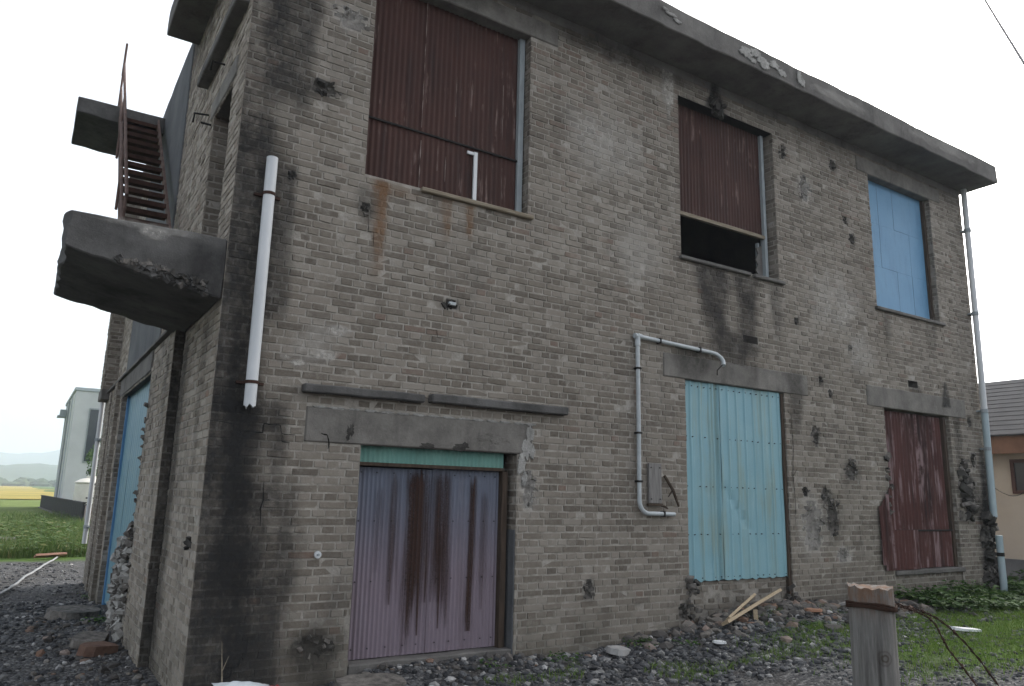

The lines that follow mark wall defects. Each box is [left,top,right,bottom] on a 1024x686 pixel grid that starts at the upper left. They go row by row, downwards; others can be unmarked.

spalling [739,46,805,87]
spalling [111,253,214,297]
leakage [699,266,758,362]
leakage [183,119,292,686]
peeling [313,405,537,508]
spalling [843,458,858,480]
corrosion [388,469,450,640]
corrosion [465,480,476,631]
spalling [582,579,595,599]
spalling [801,485,839,551]
spalling [957,452,1008,591]